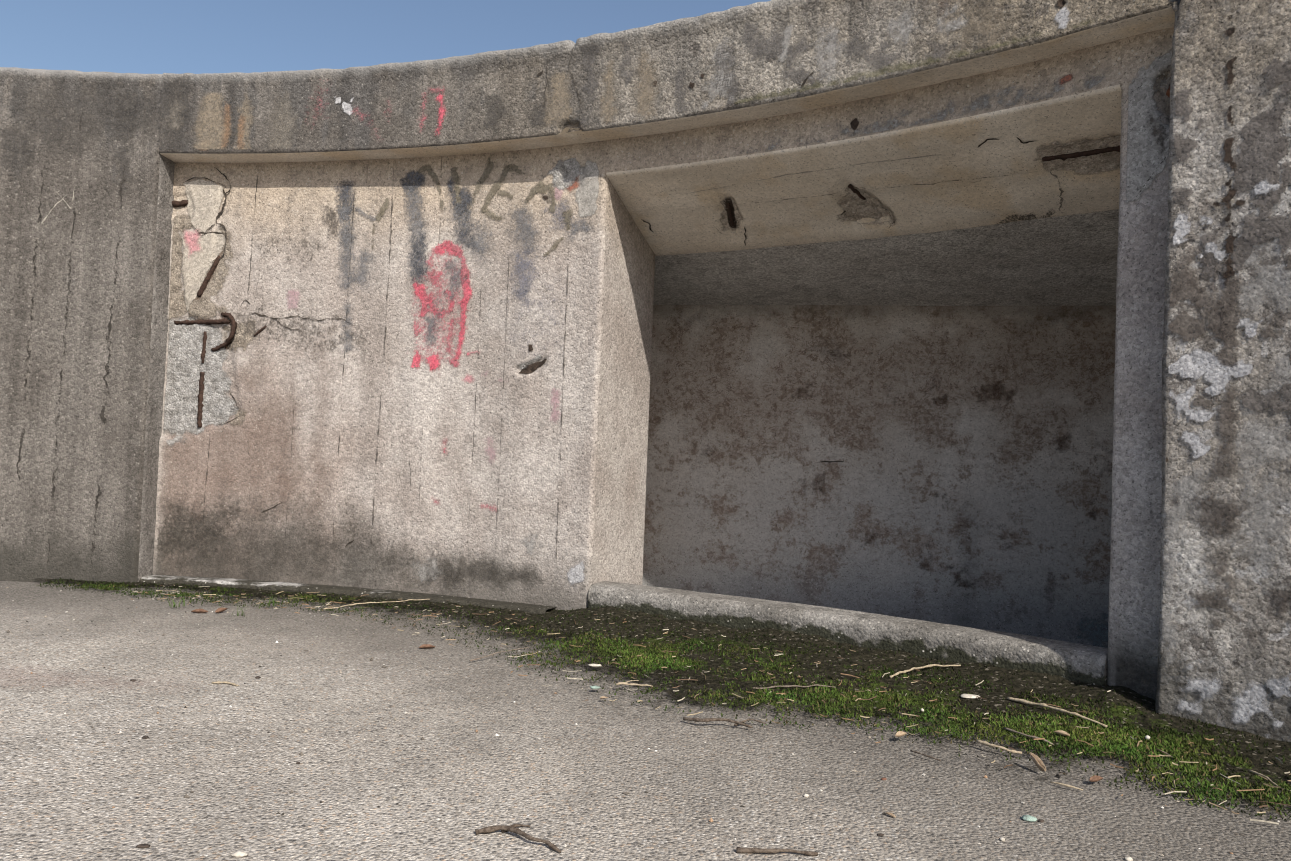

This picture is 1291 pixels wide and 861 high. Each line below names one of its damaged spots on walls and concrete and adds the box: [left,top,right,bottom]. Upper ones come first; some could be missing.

spalling [1036,136,1121,174]
crack [1213,17,1245,286]
spalling [720,198,747,245]
spalling [838,184,895,228]
spalling [163,179,366,445]
crack [240,300,361,331]
water stain [1216,276,1240,366]
spalling [518,344,547,374]
water stain [1198,387,1239,505]
water stain [158,504,534,584]
water stain [568,562,585,584]
water stain [1077,613,1109,648]